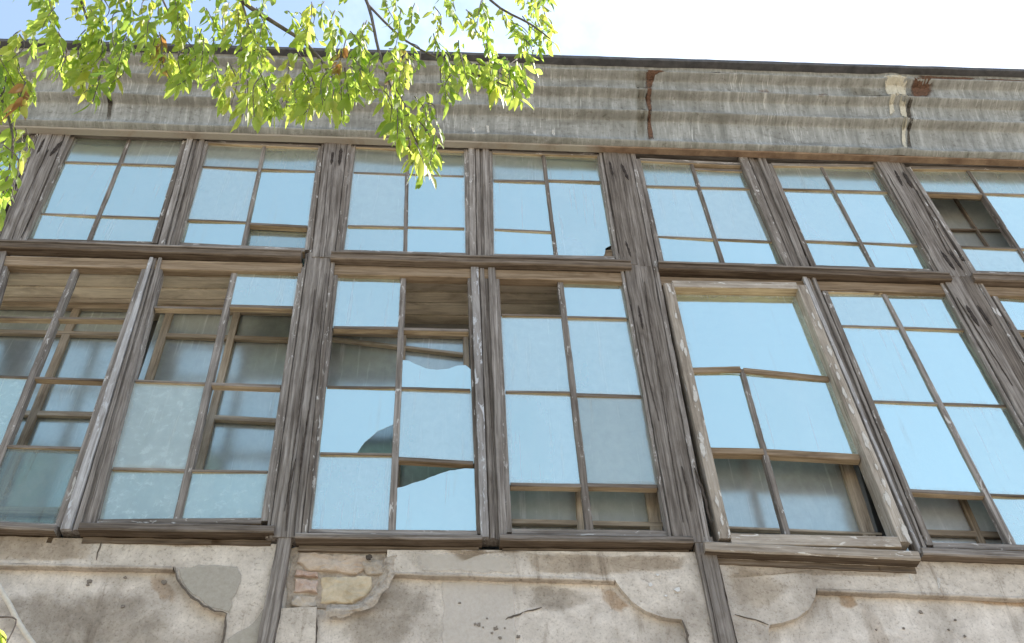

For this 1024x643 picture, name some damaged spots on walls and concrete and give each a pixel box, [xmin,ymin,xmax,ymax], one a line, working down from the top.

corrosion [645,70,663,138]
leakage [883,75,908,147]
corrosion [911,76,974,96]
spalling [286,547,397,618]
crack [506,607,542,619]